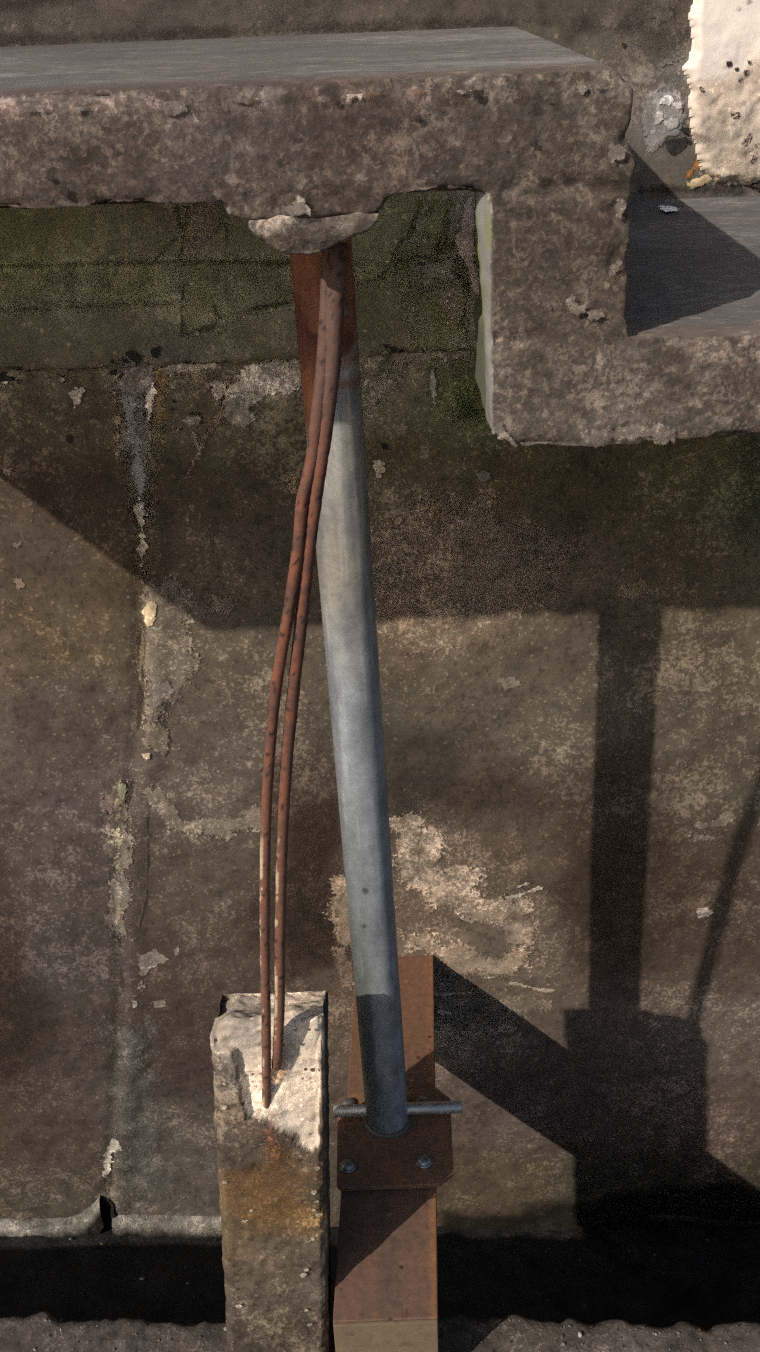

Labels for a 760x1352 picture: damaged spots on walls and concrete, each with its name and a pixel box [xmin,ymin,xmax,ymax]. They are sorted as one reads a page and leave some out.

leakage [0,0,693,46]
leakage [161,101,187,116]
leakage [282,196,311,217]
peeling [361,196,479,417]
corrosion [373,459,385,478]
spalling [0,242,350,1109]
corrosion [271,1062,284,1082]